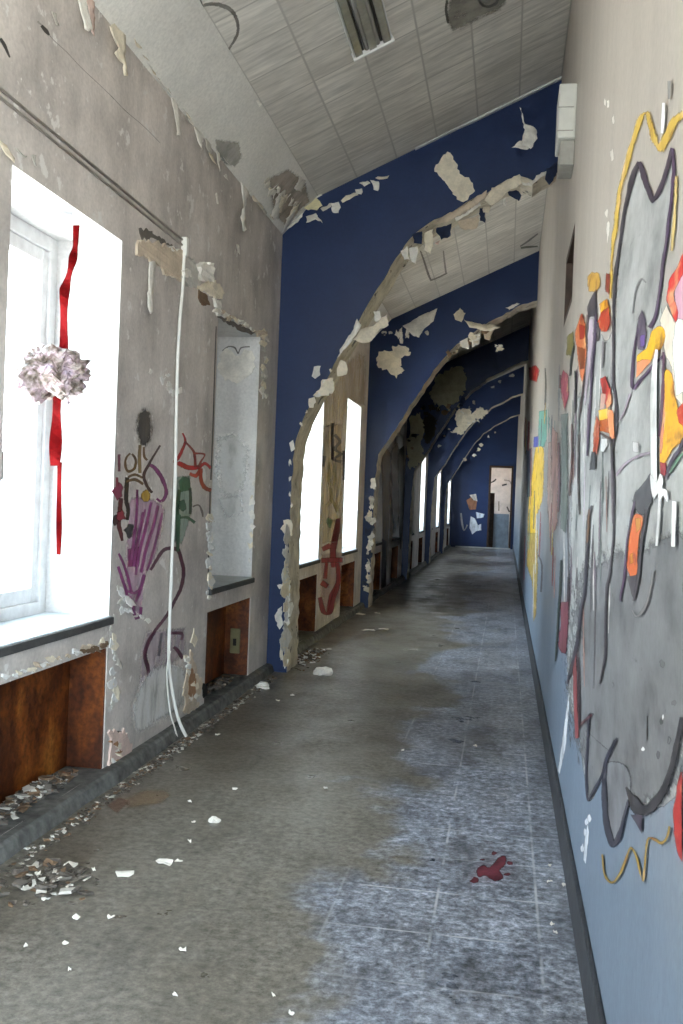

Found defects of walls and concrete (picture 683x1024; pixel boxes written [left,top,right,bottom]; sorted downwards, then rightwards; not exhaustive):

peeling [78,0,95,36]
peeling [512,108,537,150]
peeling [401,152,558,264]
spalling [135,228,269,399]
peeling [299,309,437,427]
spalling [406,309,504,469]
peeling [205,514,216,600]
peeling [247,480,256,563]
spalling [275,440,295,668]
spalling [107,628,208,766]